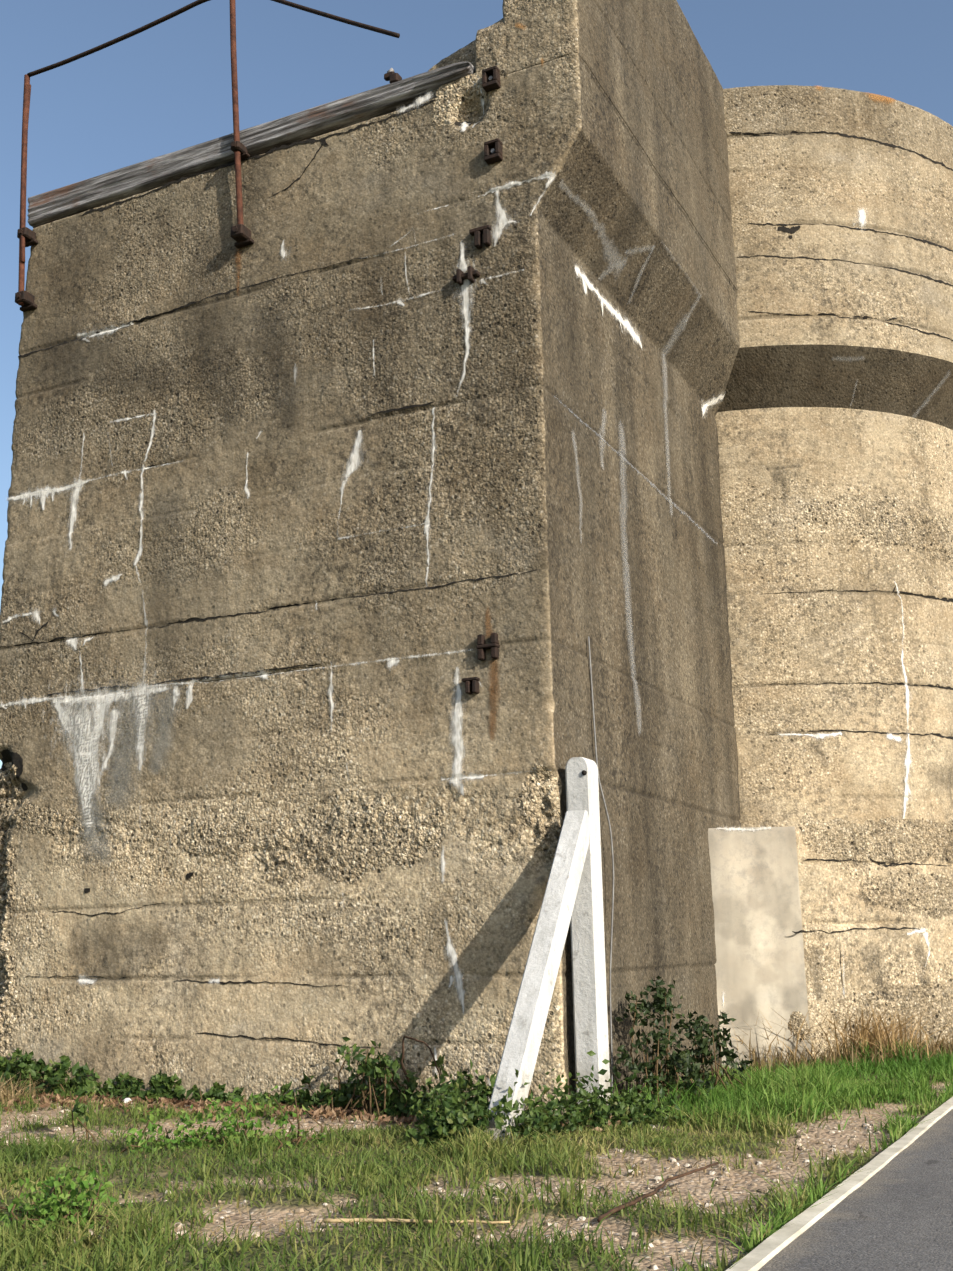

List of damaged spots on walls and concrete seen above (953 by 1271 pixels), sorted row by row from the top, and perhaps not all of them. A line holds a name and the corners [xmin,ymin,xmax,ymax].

crack [79,100,435,216]
water stain [458,242,502,390]
water stain [7,434,89,549]
water stain [109,410,166,576]
water stain [338,430,361,518]
water stain [0,637,270,832]
water stain [441,668,488,796]
spalling [0,749,87,1060]
crack [52,902,167,917]
crack [26,973,125,981]
crack [173,979,351,987]
crack [195,1032,379,1048]